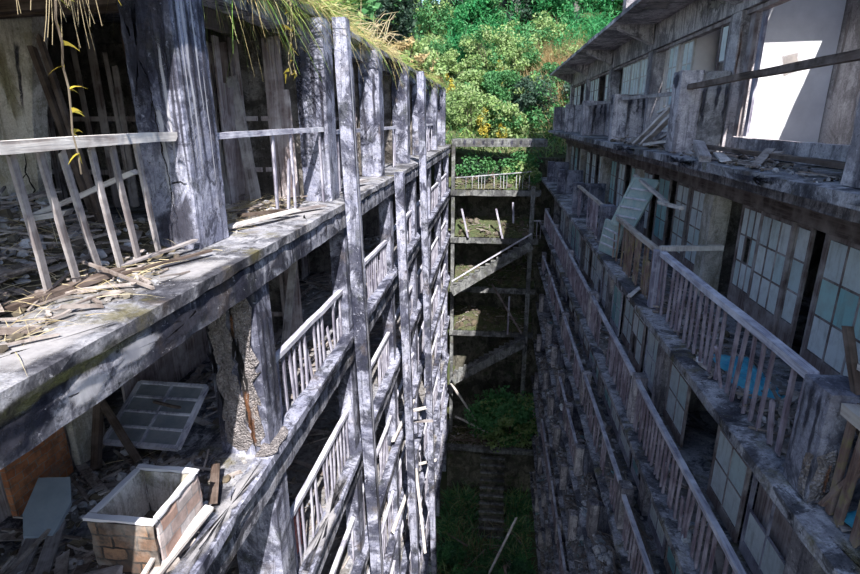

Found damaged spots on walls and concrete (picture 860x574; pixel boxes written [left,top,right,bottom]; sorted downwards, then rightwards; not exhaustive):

crack [145,72,186,219]
water stain [0,323,112,370]
water stain [67,374,107,405]
spalling [207,298,288,457]
spalling [806,450,838,503]